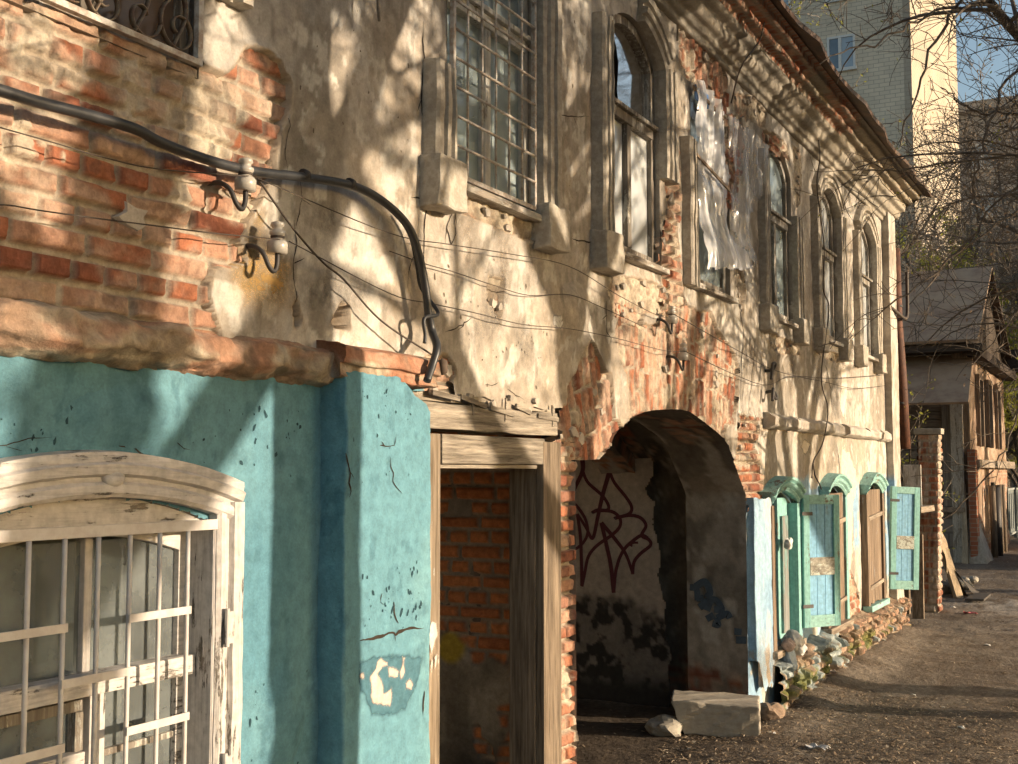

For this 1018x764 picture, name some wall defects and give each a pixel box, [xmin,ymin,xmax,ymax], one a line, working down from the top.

flaking render [0,0,286,336]
spalling [486,278,503,318]
flaking render [462,195,535,240]
flaking render [608,170,765,512]
flaking render [677,24,801,210]
crack [360,595,422,641]
peeling [360,655,422,715]
flaking render [425,315,619,764]